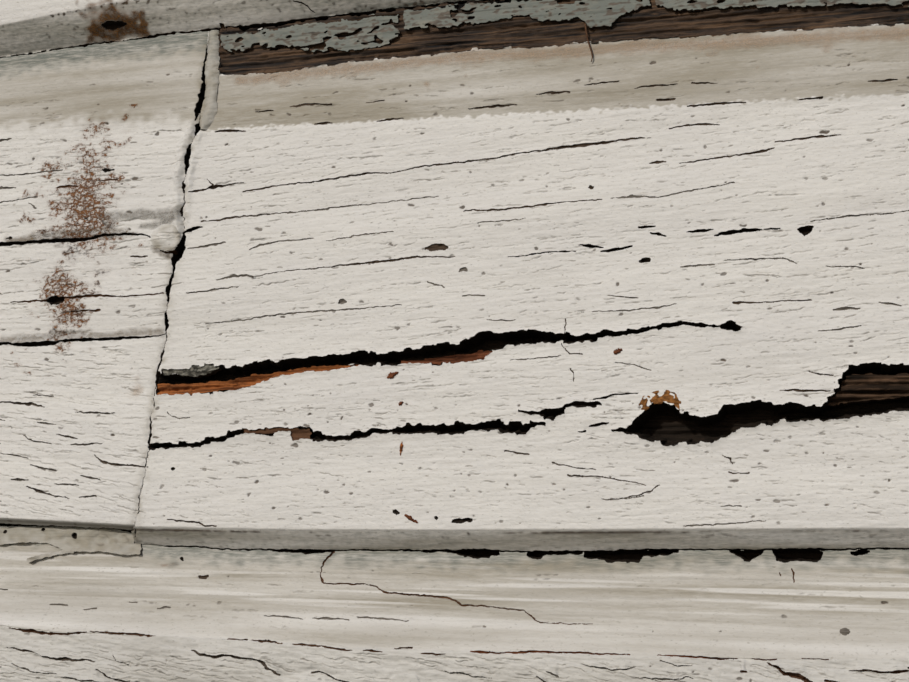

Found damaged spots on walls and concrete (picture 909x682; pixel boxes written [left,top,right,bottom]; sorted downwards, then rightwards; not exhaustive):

corrosion [88,0,149,43]
peeling [220,0,909,53]
crack [0,232,151,258]
corrosion [23,119,129,352]
crack [508,225,666,257]
crack [688,228,781,236]
crack [186,256,455,294]
crack [0,292,164,313]
crack [0,334,165,347]
crack [150,295,812,455]
crack [320,551,587,625]
crack [470,648,630,656]